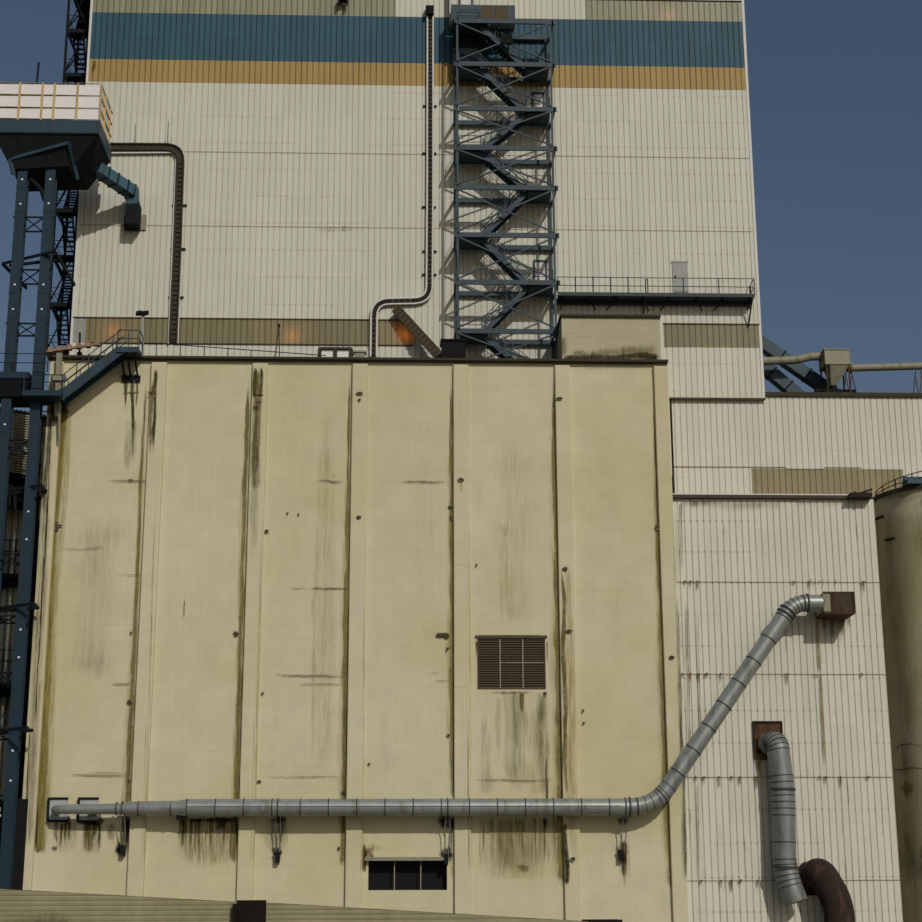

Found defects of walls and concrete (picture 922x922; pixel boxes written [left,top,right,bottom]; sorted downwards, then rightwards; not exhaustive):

water stain [26,411,71,852]
water stain [124,371,157,802]
water stain [234,368,263,799]
water stain [342,395,350,799]
water stain [496,692,524,745]
water stain [539,395,572,798]
rust [815,614,850,757]
water stain [82,815,103,848]
water stain [116,815,130,854]
water stain [179,816,238,860]
water stain [534,816,569,883]